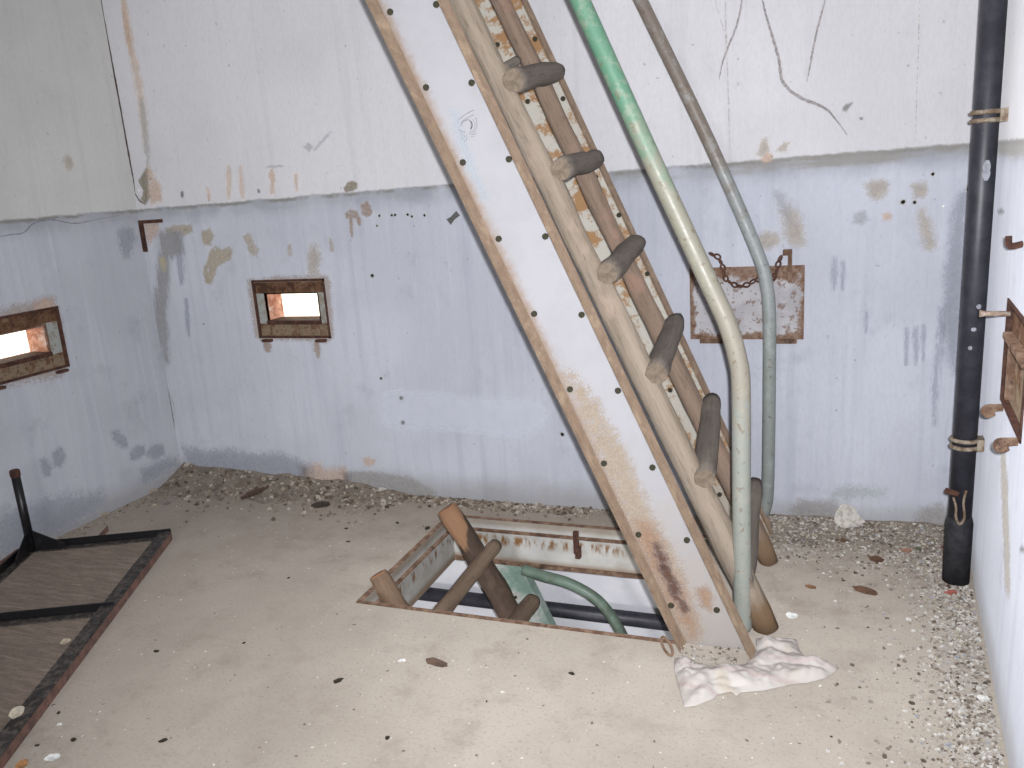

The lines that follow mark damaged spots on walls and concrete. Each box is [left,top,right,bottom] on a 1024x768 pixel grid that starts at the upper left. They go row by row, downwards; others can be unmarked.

crack [101,0,146,204]
crack [715,0,847,142]
rust [2,299,55,316]
peeling [166,225,232,284]
rust [249,249,333,358]
rust [561,368,711,641]